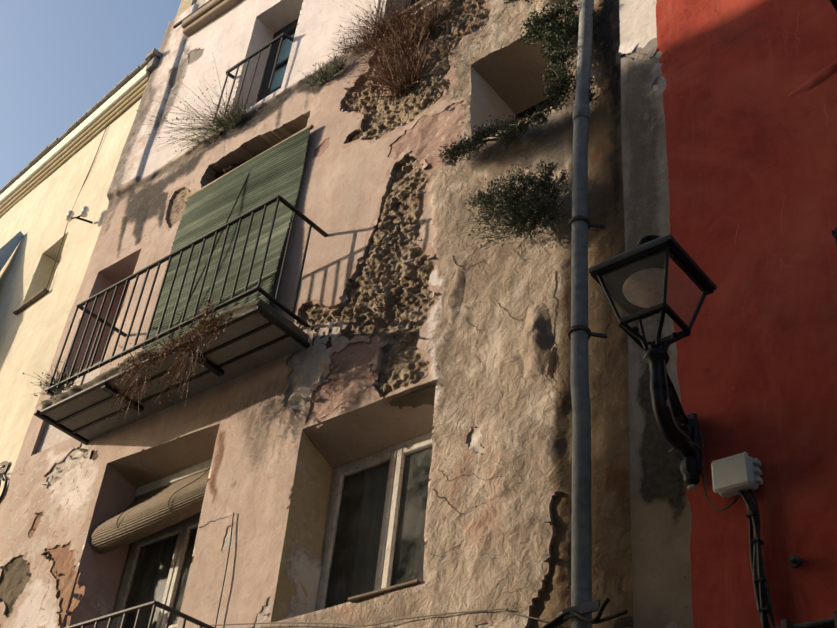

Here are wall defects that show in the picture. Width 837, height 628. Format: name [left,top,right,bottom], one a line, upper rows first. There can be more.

peeling [169,49,203,87]
water stain [116,77,329,250]
spalling [285,0,491,428]
water stain [597,0,657,249]
crack [535,271,566,405]
peeling [42,443,98,488]
crack [433,460,510,521]
water stain [638,366,685,519]
spalling [0,556,31,617]
peeling [41,544,85,628]
peeling [254,548,323,628]
peeling [529,493,571,628]